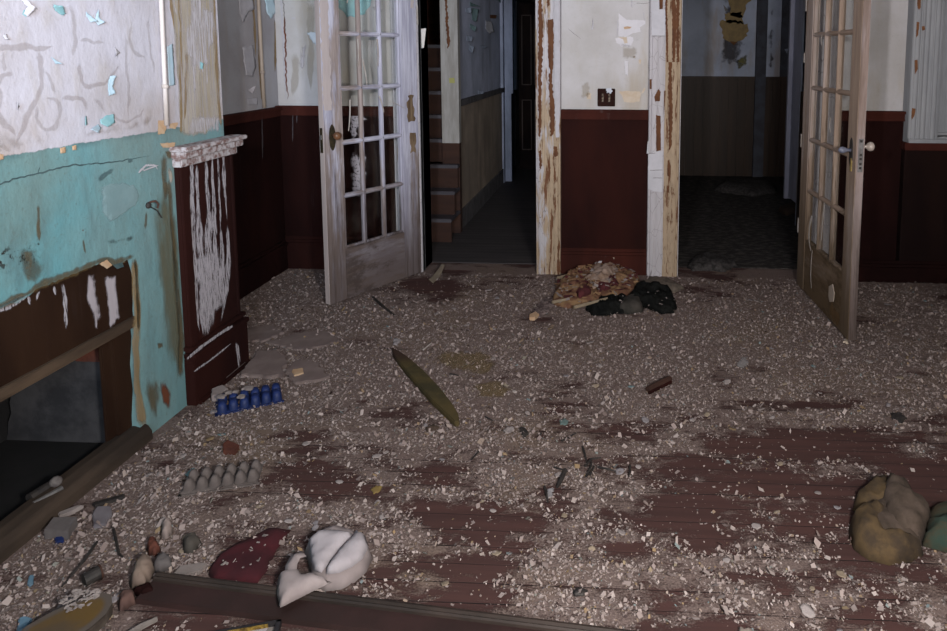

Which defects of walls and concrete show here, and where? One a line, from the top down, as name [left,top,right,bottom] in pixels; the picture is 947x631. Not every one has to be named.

peeling [22,0,66,21]
peeling [719,0,751,45]
peeling [108,75,116,96]
peeling [538,0,560,157]
peeling [615,0,680,193]
peeling [85,114,115,133]
crack [0,156,147,185]
spalling [0,256,131,309]